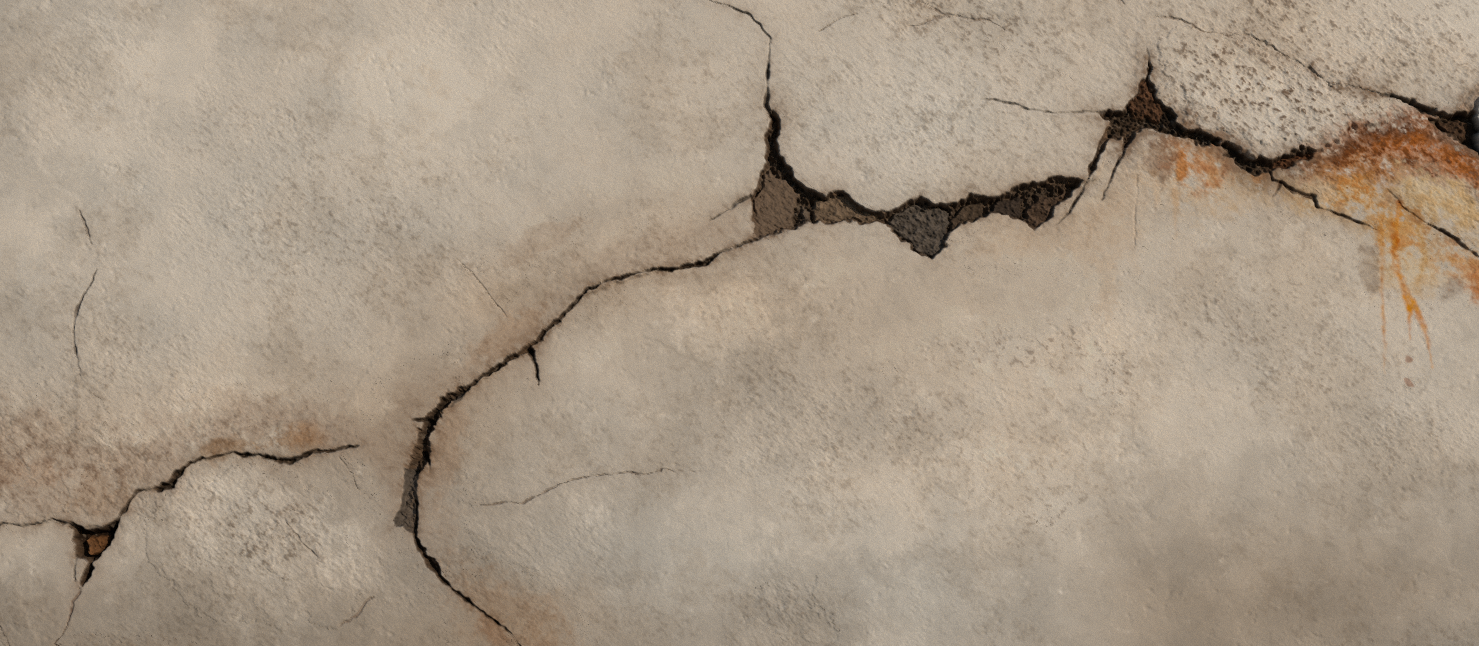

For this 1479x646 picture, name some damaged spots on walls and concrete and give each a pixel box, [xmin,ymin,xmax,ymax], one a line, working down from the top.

corrosion [1141,96,1479,388]
crack [394,0,1479,646]
crack [115,444,365,524]
crack [0,518,74,529]
crack [282,510,319,558]
crack [57,590,81,646]
crack [338,597,374,627]